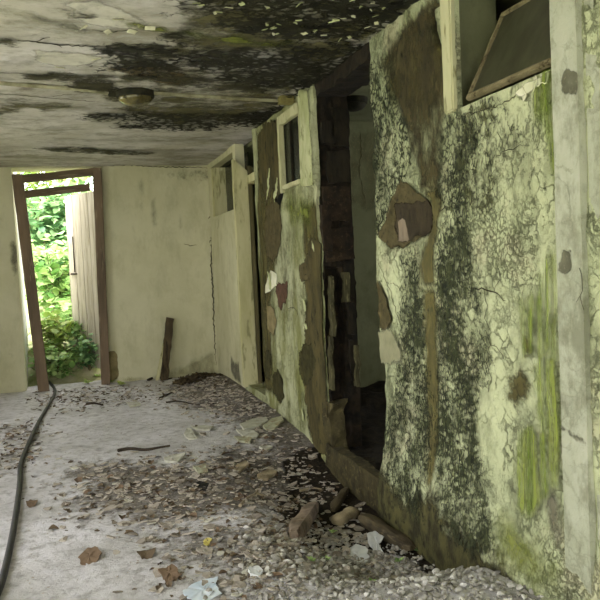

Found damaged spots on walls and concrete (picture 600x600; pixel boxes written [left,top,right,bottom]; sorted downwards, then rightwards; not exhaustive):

leakage [0,98,70,115]
leakage [23,0,419,132]
crack [446,95,526,158]
flaking render [257,119,282,263]
flaking render [378,180,433,249]
crack [208,217,219,363]
flaking render [265,271,288,335]
flaking render [376,281,391,330]
leakage [369,0,519,581]
crack [474,268,505,391]
leakage [507,370,529,412]
leakage [517,256,583,537]